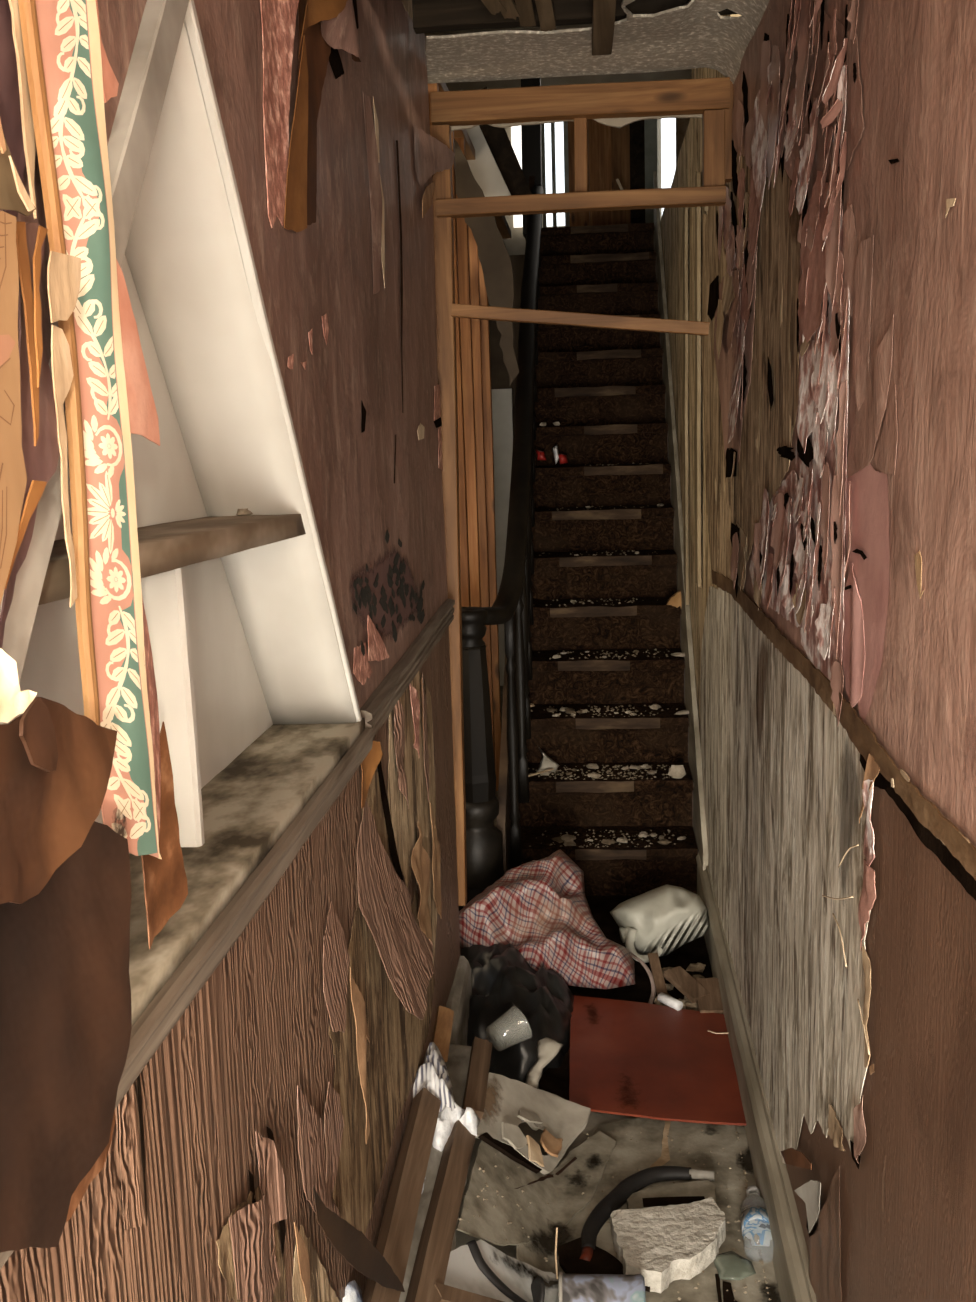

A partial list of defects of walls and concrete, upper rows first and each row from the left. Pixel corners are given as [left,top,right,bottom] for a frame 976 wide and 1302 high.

peeling [0,119,36,217]
leakage [350,529,425,656]
flaking render [700,0,898,1169]
peeling [361,741,383,808]
flaking render [216,1187,286,1302]